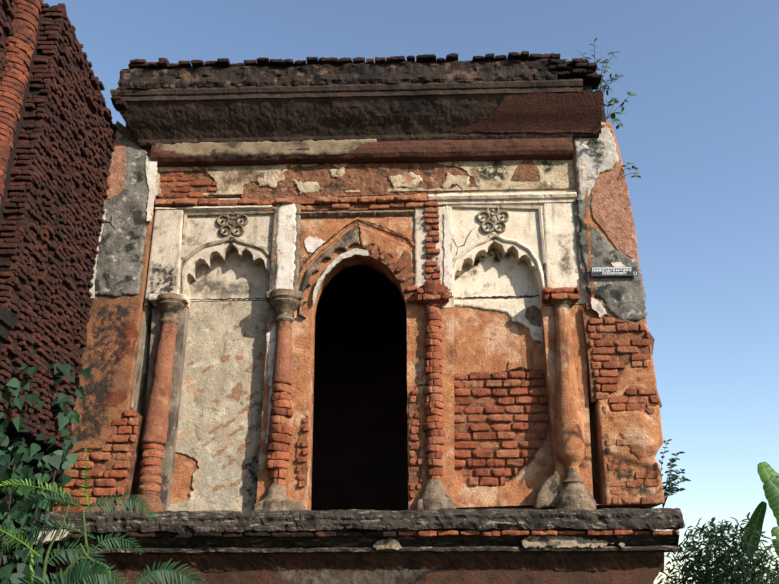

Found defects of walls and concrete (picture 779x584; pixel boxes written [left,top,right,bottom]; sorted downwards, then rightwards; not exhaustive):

peeling [89,130,478,305]
peeling [454,91,662,411]
water stain [73,305,129,441]
spalling [52,326,276,512]
spalling [454,369,550,487]